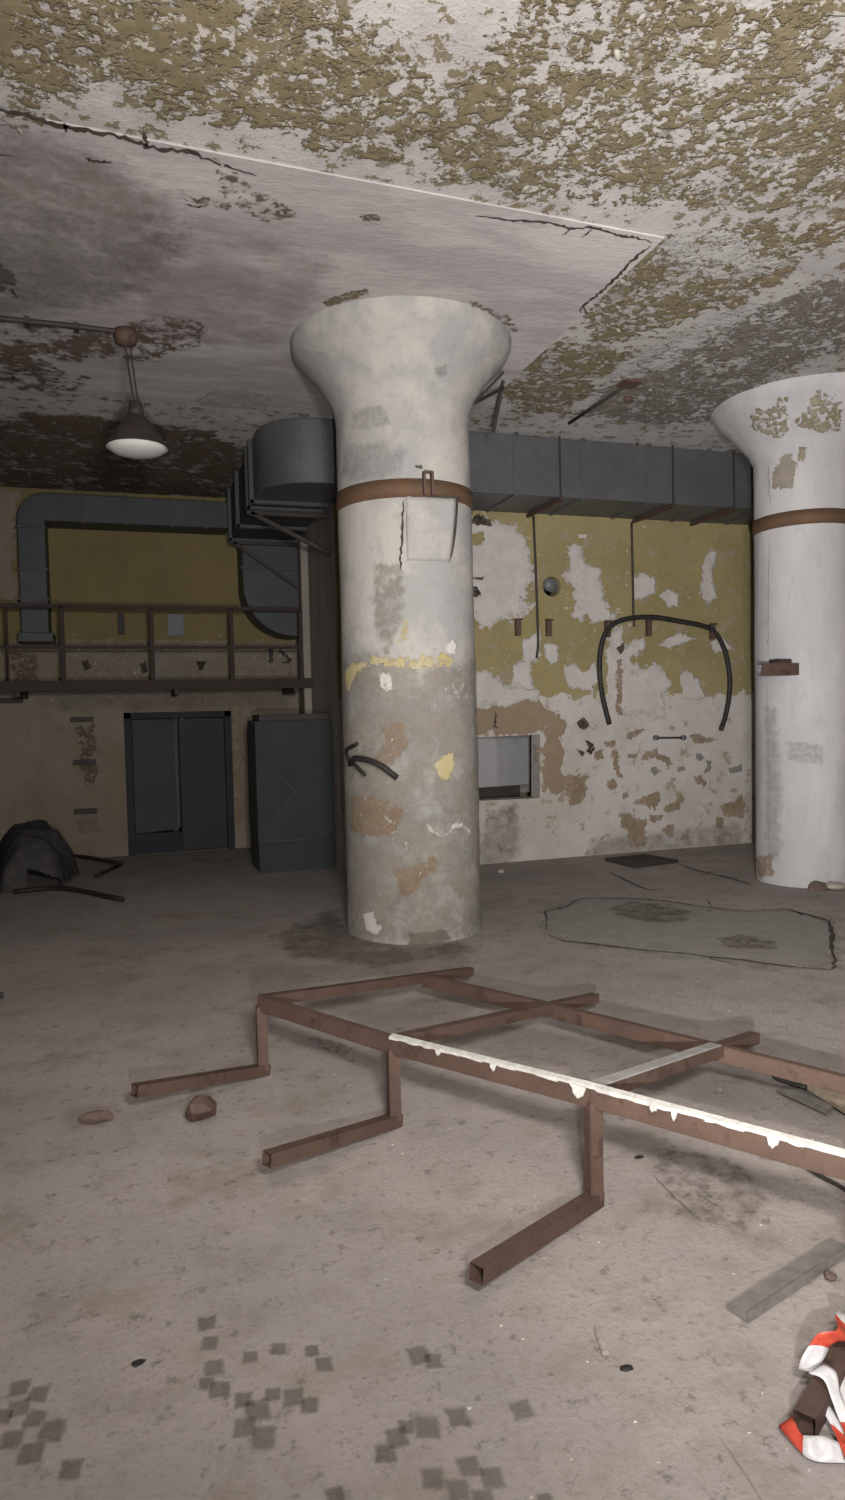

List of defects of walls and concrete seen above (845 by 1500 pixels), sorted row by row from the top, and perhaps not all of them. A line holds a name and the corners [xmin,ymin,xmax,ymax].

crack [0,108,256,176]
peeling [0,0,845,490]
crack [478,216,652,314]
water stain [0,324,119,393]
water stain [0,412,244,498]
peeling [234,644,291,679]
peeling [345,495,742,847]
flaking render [229,705,245,823]
crack [544,696,837,970]
peeling [363,911,382,936]